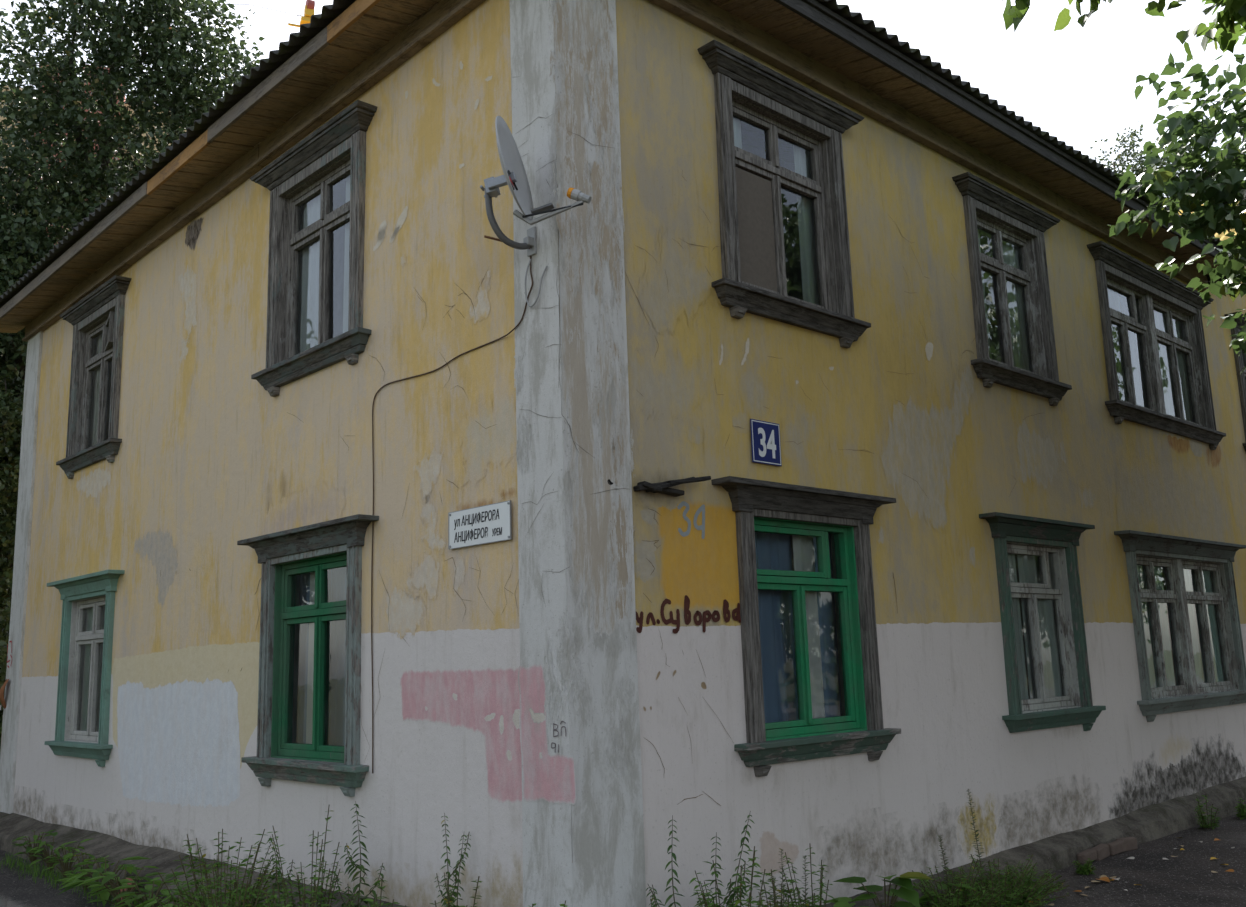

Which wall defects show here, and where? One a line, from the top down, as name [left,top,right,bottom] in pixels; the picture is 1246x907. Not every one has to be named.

peeling [879,359,976,532]
peeling [134,527,180,610]
crack [521,266,732,806]
leakage [813,802,967,897]
leakage [991,733,1246,855]